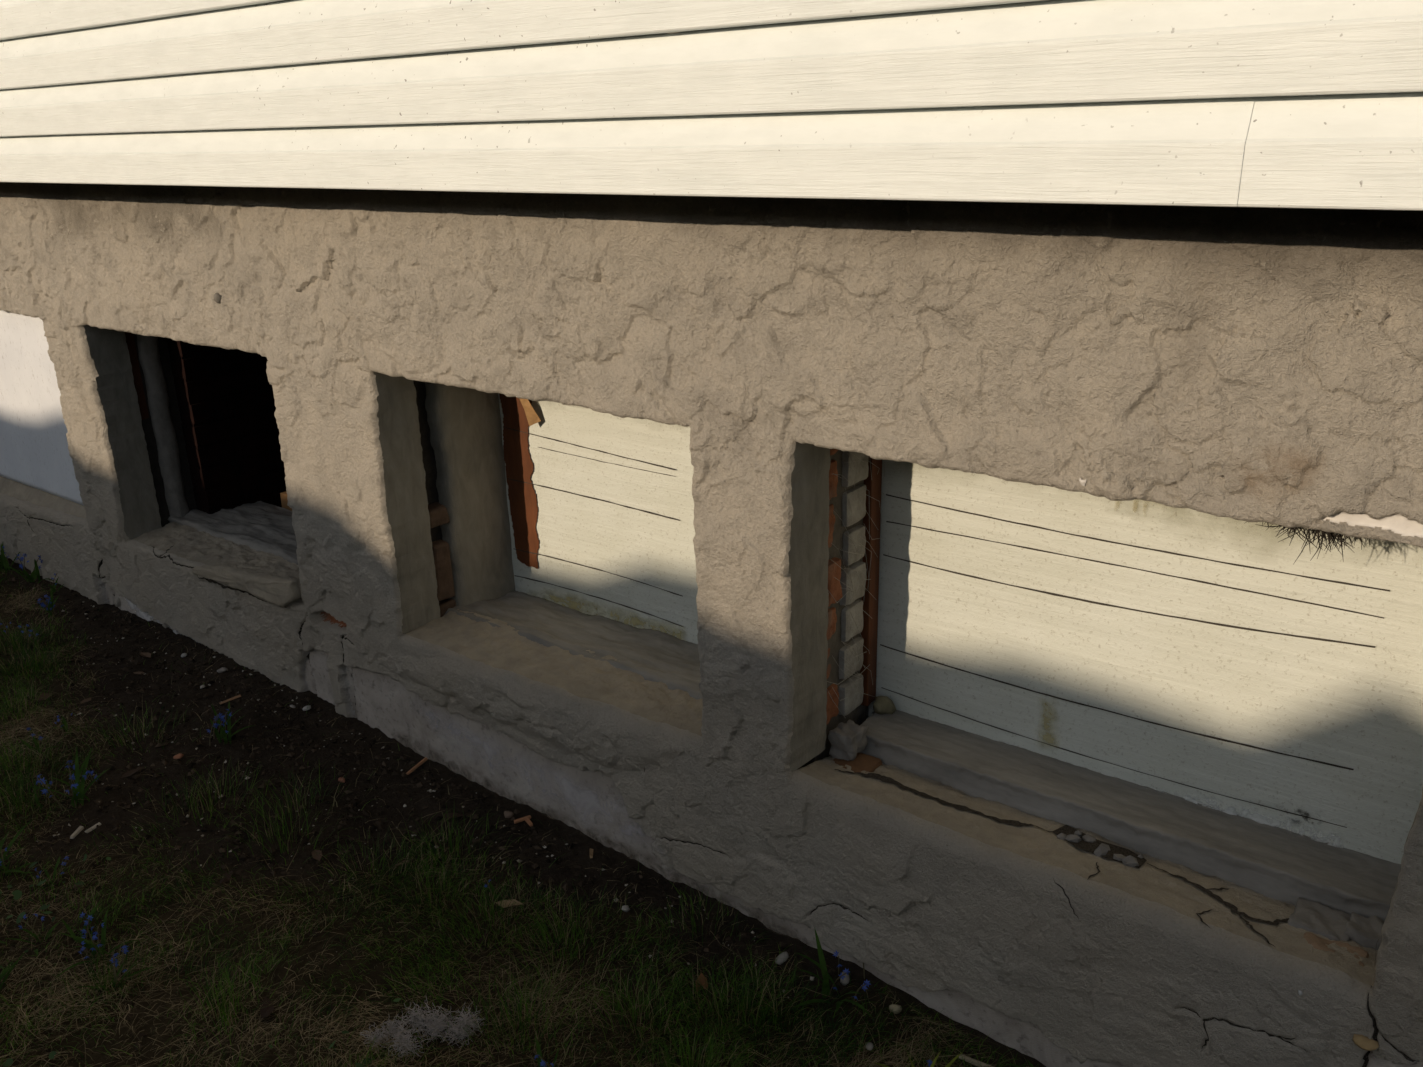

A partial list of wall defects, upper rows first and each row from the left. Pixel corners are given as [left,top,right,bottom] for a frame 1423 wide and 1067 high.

crack [661,837,730,858]
crack [1362,941,1416,1067]
crack [1175,1007,1307,1052]